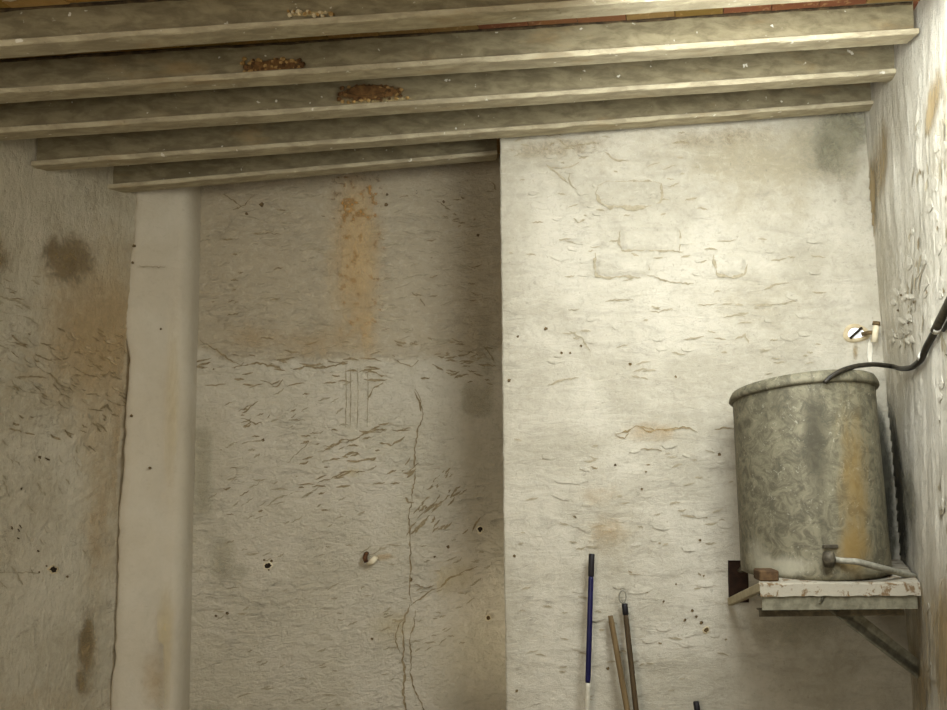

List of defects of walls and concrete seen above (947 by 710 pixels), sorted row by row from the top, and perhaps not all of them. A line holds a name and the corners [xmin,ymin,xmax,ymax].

spalling [240,57,305,72]
spalling [337,84,409,104]
crack [395,389,476,710]